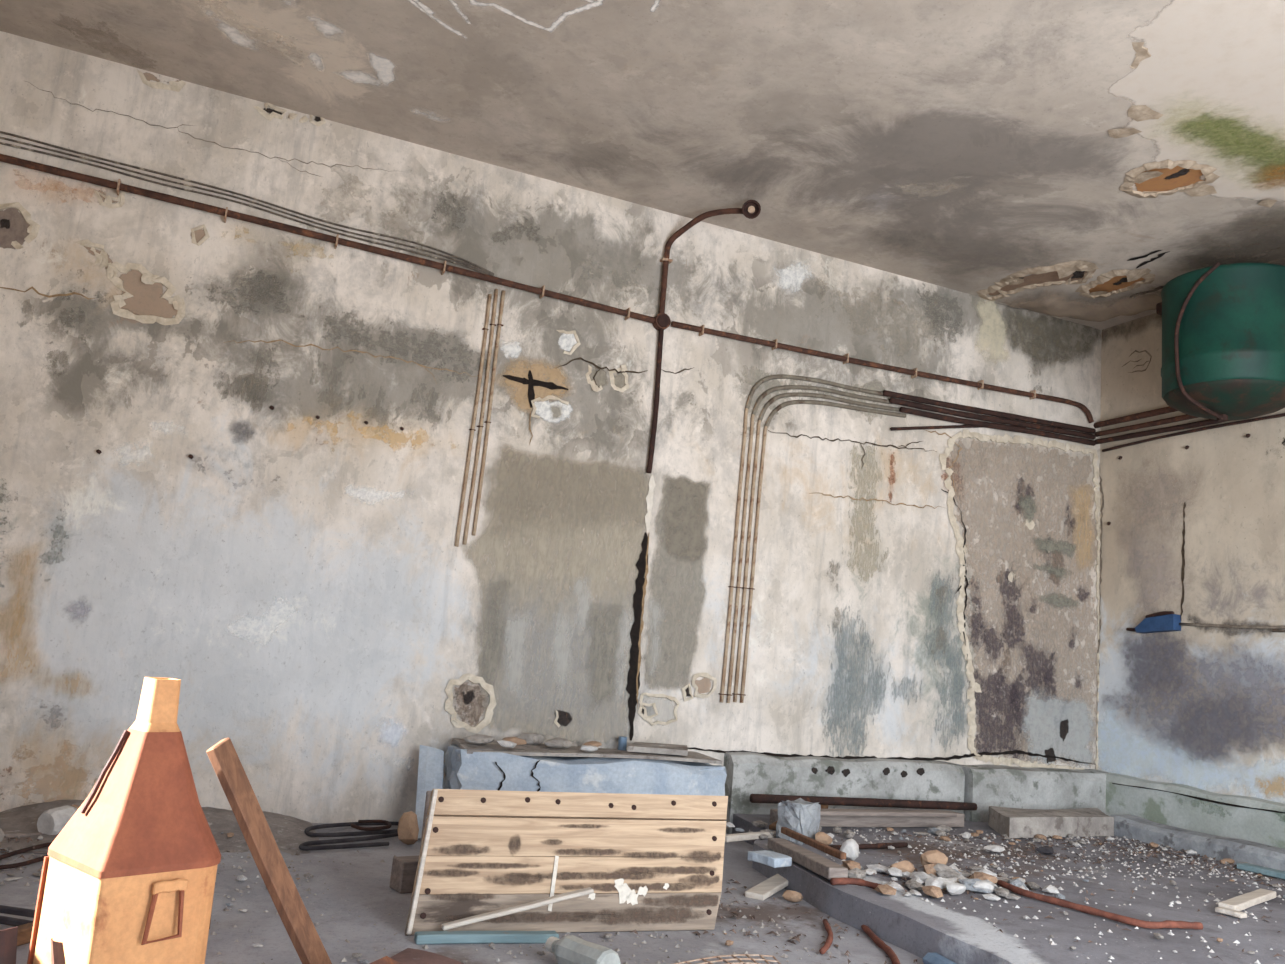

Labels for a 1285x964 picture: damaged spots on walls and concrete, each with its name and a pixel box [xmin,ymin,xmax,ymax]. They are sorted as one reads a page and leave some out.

crack [26,81,389,177]
peeling [1108,0,1285,208]
flaking render [0,202,40,249]
water stain [1191,218,1285,266]
water stain [325,312,487,380]
crack [557,357,692,389]
crack [687,429,1285,814]
flaking render [939,430,1101,770]
water stain [1189,616,1271,635]
spalling [445,673,722,764]
water stain [1097,635,1285,800]
crack [495,760,541,791]